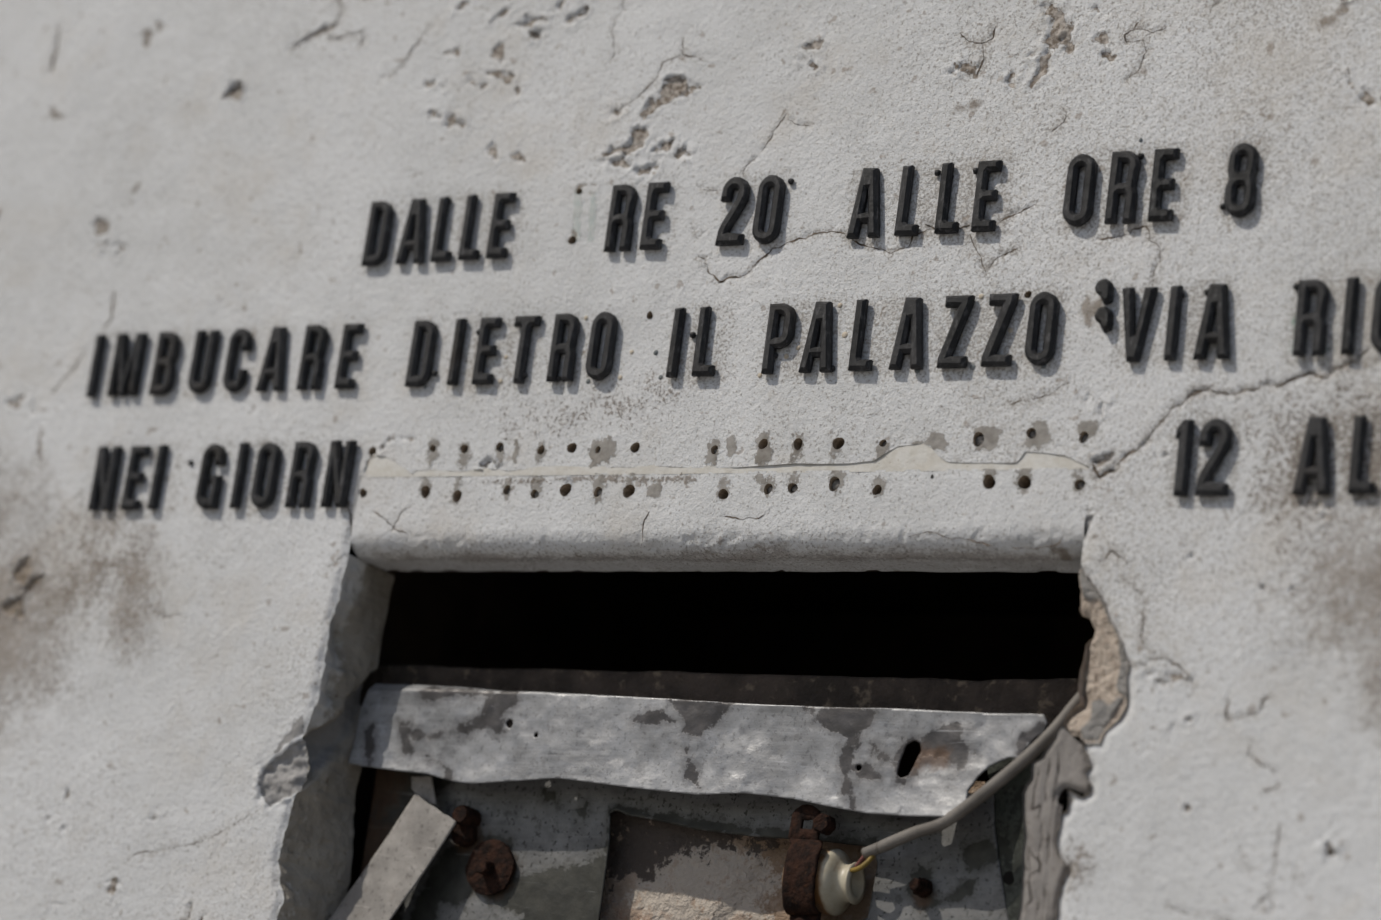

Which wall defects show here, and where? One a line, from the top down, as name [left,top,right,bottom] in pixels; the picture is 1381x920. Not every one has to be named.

spalling [602,76,701,176]
crack [693,205,1033,283]
crack [1092,349,1370,478]
spalling [1064,568,1130,745]
spalling [258,741,309,807]